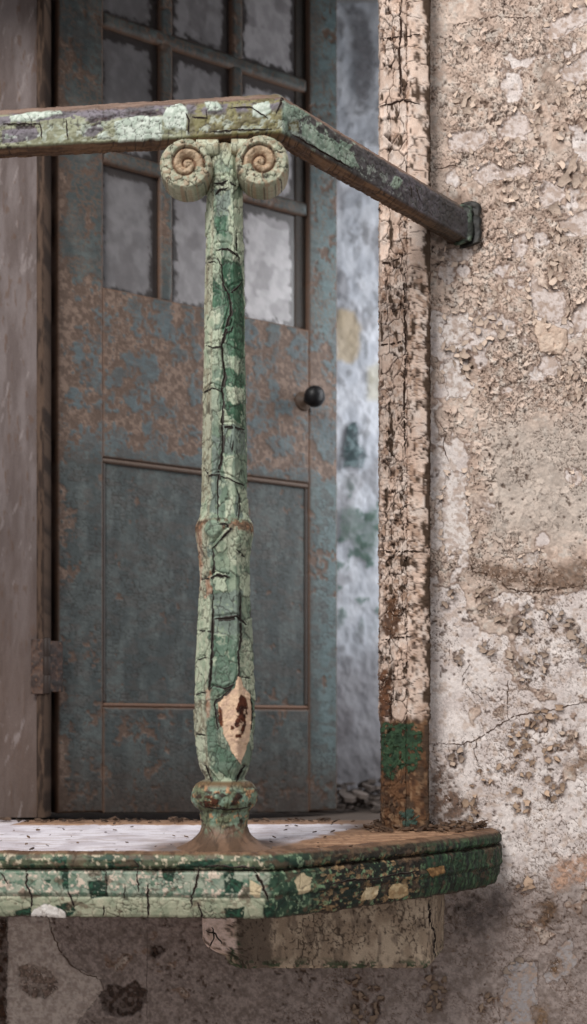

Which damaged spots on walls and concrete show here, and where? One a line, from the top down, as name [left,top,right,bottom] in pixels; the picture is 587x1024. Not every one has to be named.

crack [380,2,420,106]
peeling [544,0,587,42]
peeling [448,49,587,337]
crack [381,258,407,450]
peeling [438,278,511,403]
peeling [538,352,587,402]
peeling [436,468,476,556]
peeling [475,586,551,683]
peeling [546,609,587,668]
peeling [447,747,465,768]
crack [443,666,586,762]
peeling [462,704,579,822]